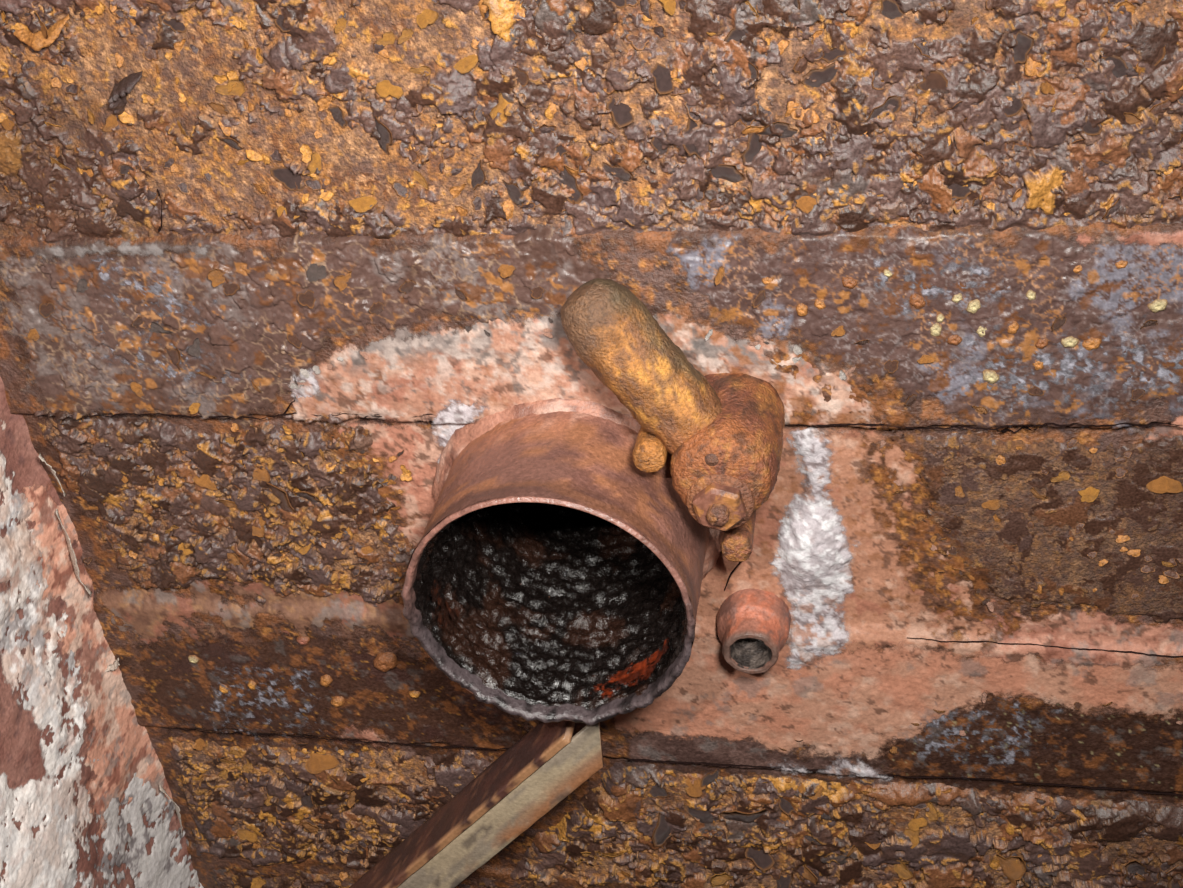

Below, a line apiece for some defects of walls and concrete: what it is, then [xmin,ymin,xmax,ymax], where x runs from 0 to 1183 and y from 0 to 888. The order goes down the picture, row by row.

peeling [208,269,240,296]
peeling [297,263,352,309]
peeling [498,264,516,278]
peeling [131,316,181,370]
peeling [130,382,143,397]
peeling [284,312,632,549]
peeling [0,451,416,888]
corrosion [594,639,668,697]